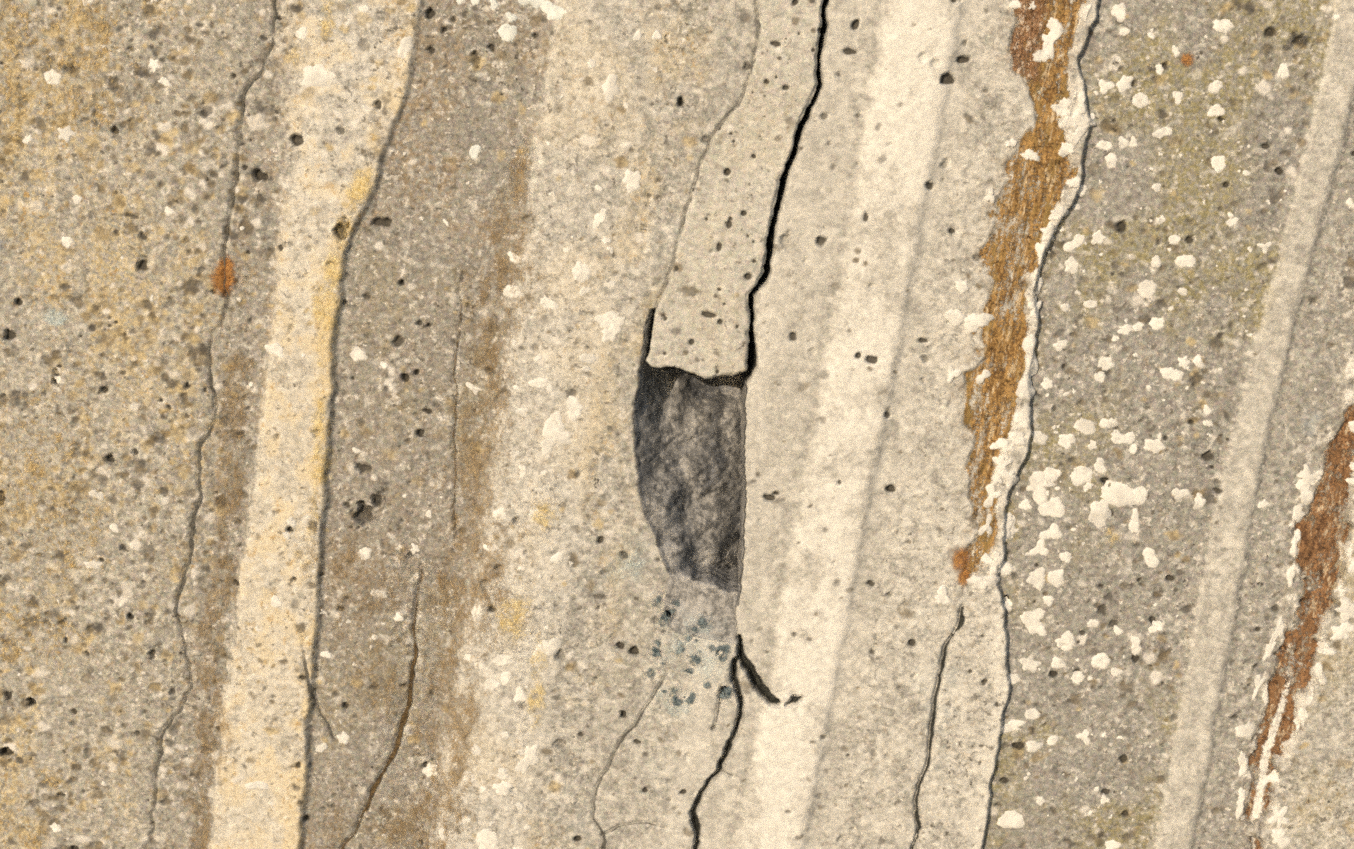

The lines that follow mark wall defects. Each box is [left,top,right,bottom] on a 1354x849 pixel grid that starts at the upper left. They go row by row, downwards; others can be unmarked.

crack [657,14,761,307]
crack [743,0,827,380]
rust [953,0,1086,585]
crack [592,673,668,849]
spalling [633,309,747,644]
crack [692,634,801,849]
crack [911,606,964,849]
rust [1242,405,1354,821]